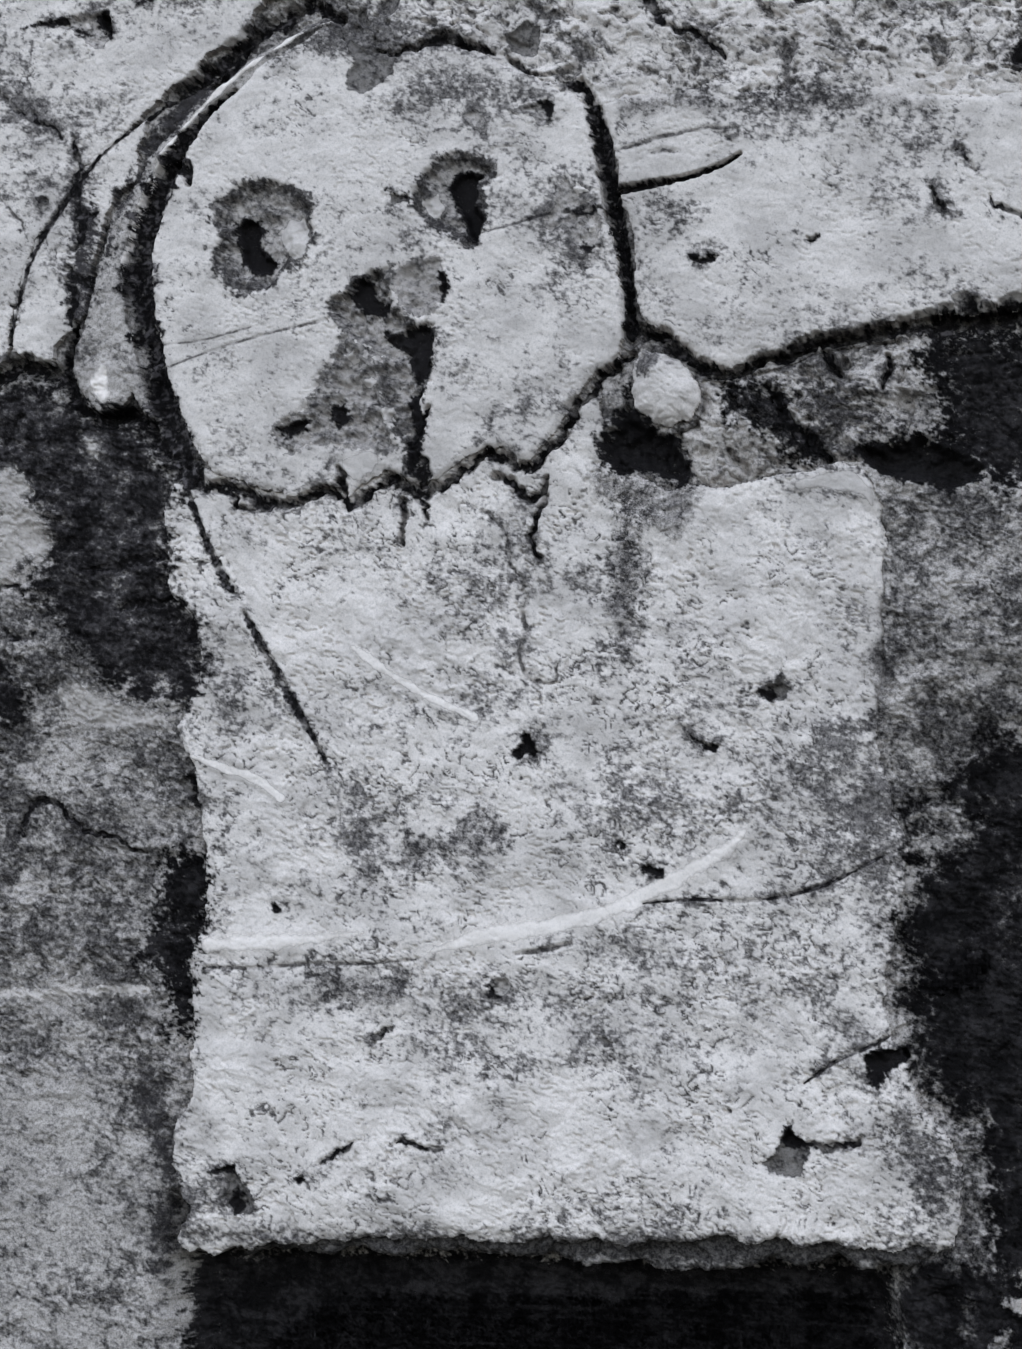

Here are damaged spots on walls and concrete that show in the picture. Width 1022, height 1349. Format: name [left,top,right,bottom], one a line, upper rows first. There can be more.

crack [0,0,1022,770]